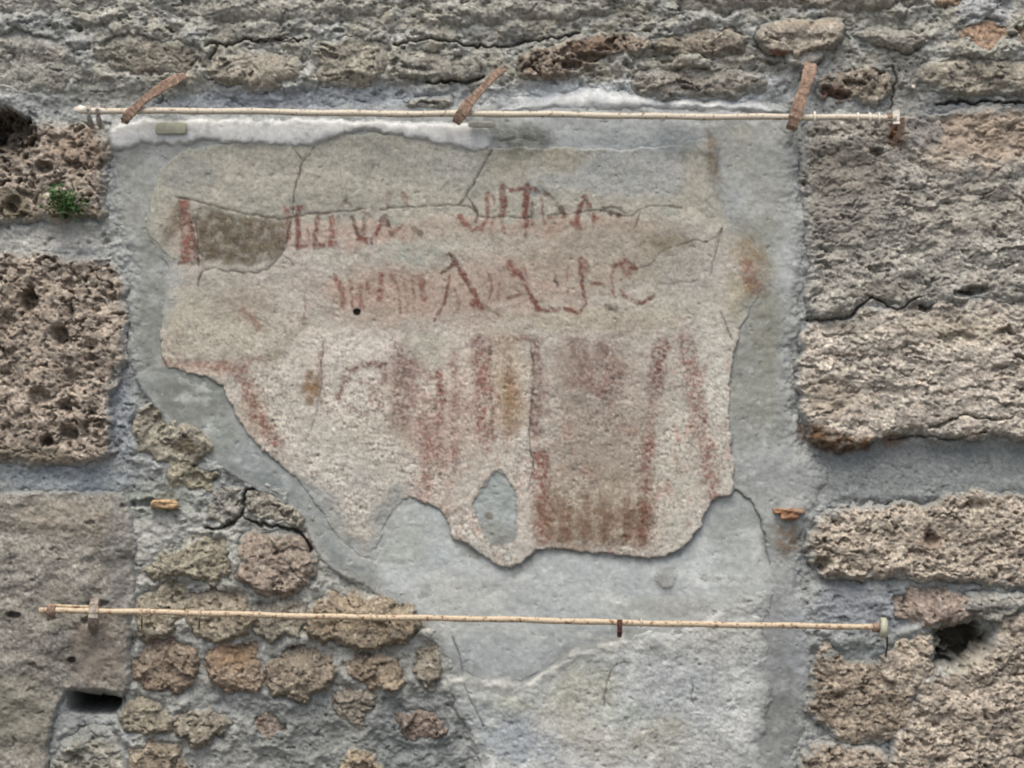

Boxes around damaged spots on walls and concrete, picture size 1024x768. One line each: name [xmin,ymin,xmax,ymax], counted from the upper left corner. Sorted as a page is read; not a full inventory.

spalling [135,366,773,681]